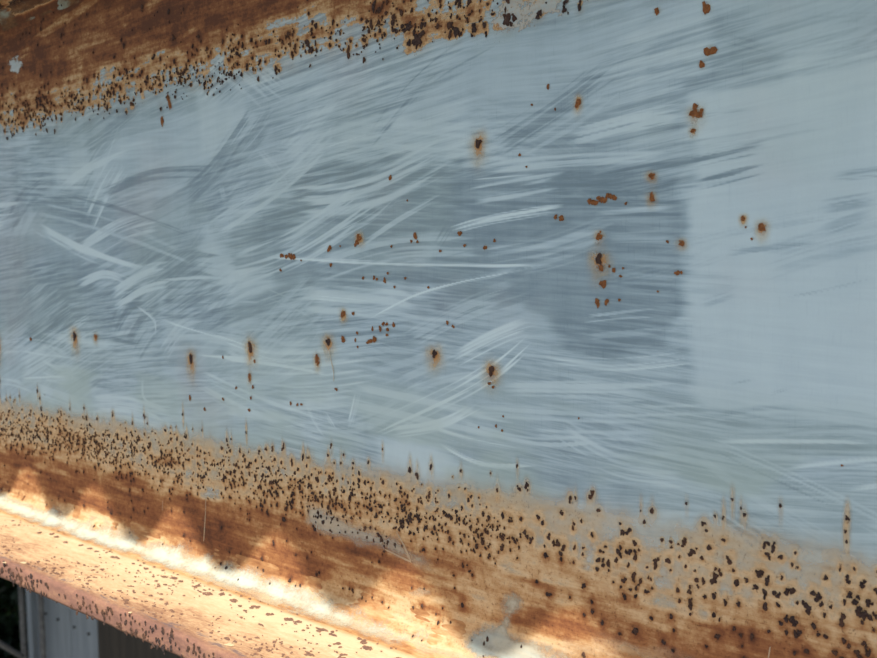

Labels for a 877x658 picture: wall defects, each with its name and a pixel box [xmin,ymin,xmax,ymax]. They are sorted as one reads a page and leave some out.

peeling [491,0,562,32]
corrosion [0,0,517,140]
corrosion [699,46,718,68]
corrosion [689,103,704,135]
corrosion [474,136,483,155]
corrosion [587,193,627,205]
corrosion [592,253,624,308]
corrosion [315,322,395,391]
corrosion [486,364,498,389]
corrosion [0,390,877,658]